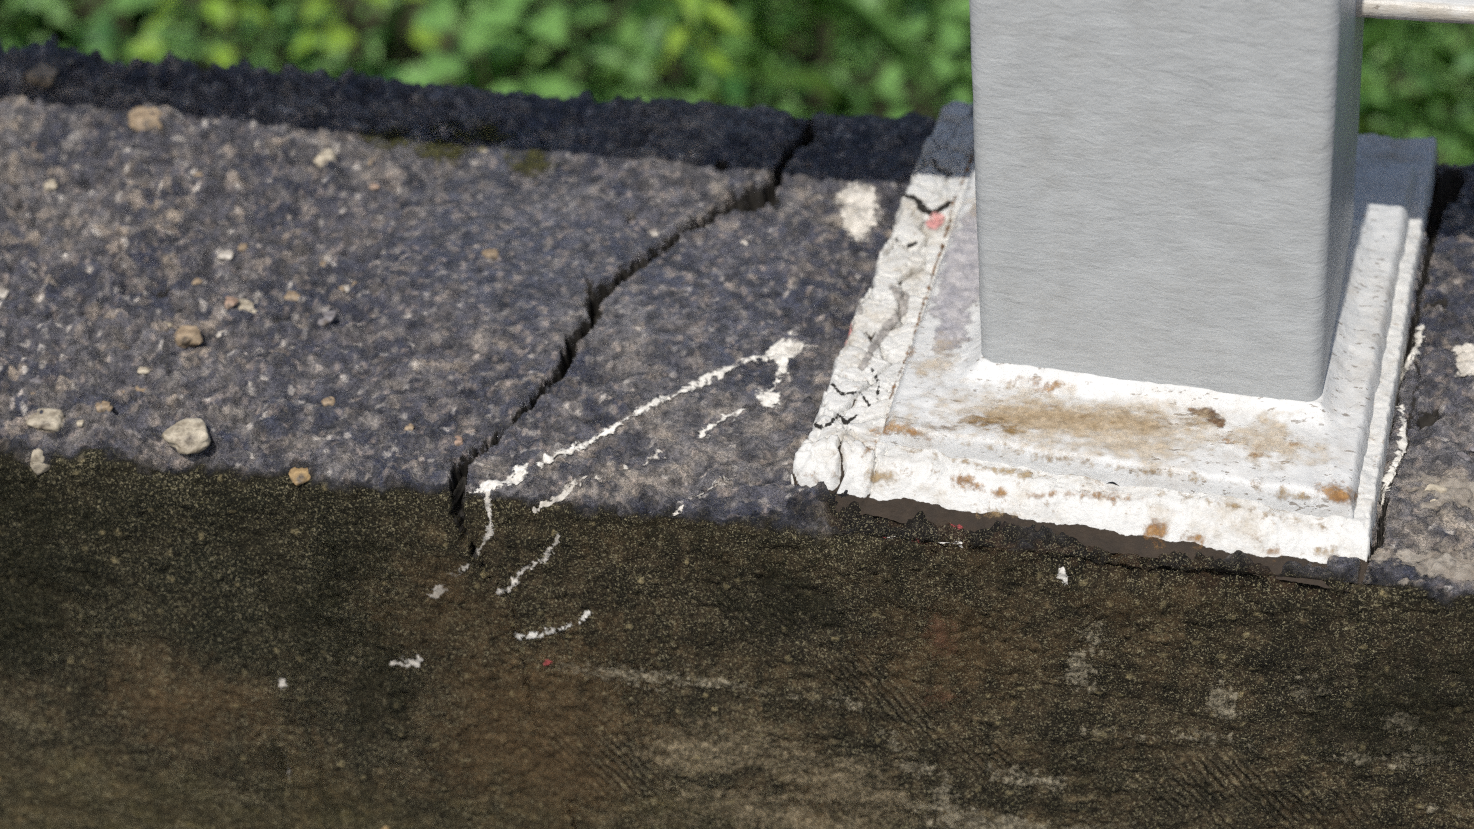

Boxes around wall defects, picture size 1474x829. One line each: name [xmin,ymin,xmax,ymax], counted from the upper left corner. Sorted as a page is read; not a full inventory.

crack [813,147,974,429]
crack [445,119,814,746]
corrosion [966,381,1303,475]
corrosion [870,471,892,482]
corrosion [952,459,1032,516]
corrosion [1279,486,1358,503]
corrosion [1144,523,1166,538]
efflorescence [559,663,751,692]